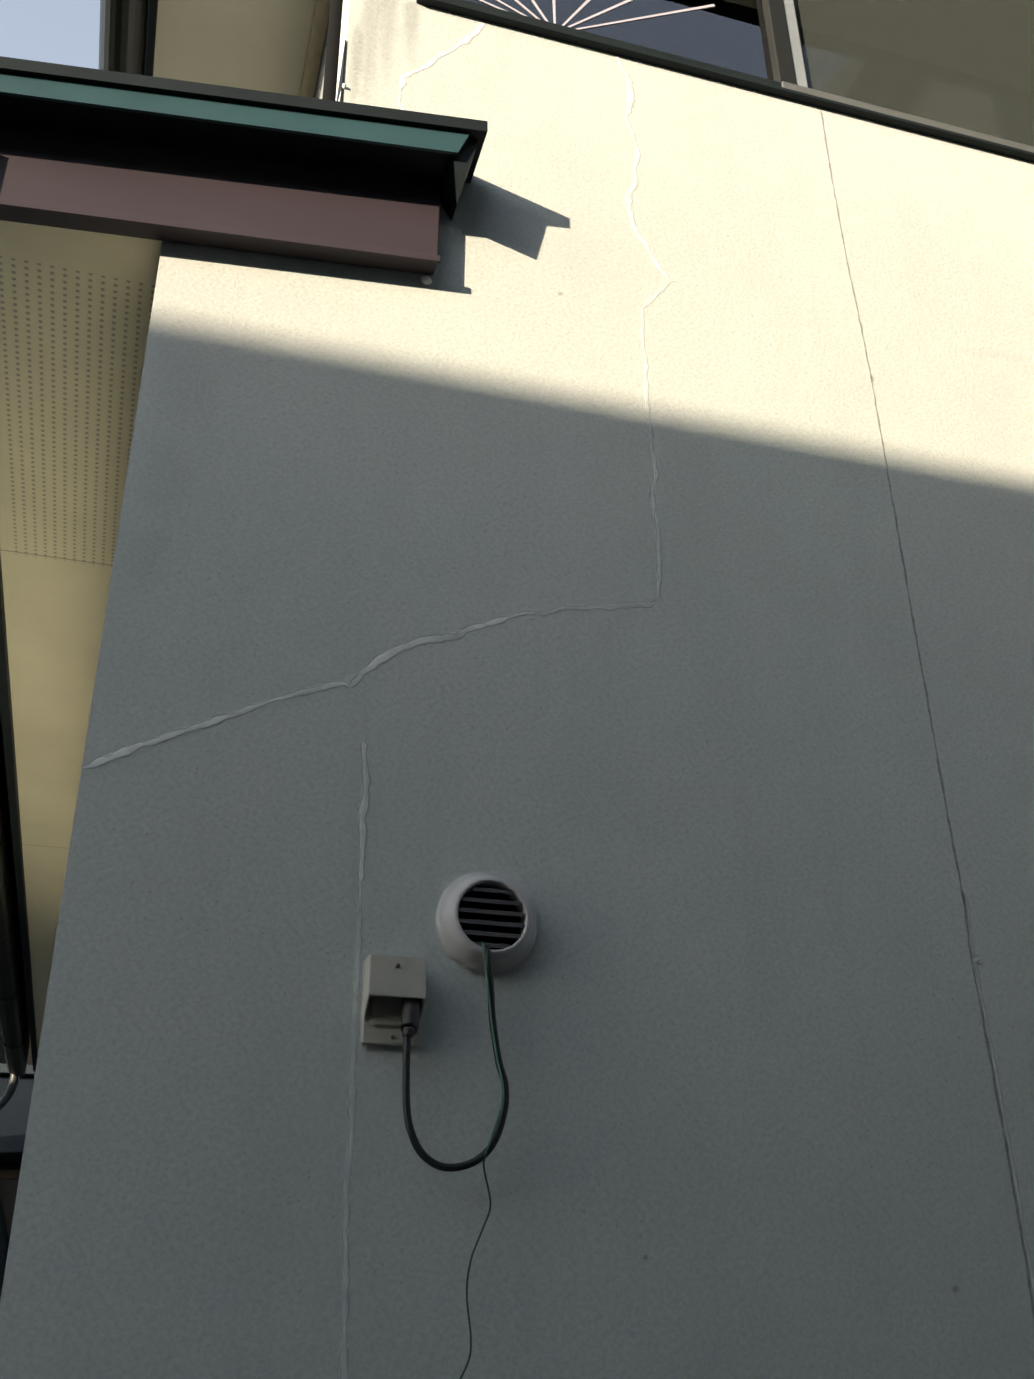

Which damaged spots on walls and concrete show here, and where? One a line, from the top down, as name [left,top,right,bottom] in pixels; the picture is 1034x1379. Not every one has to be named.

crack [397,23,484,110]
crack [82,56,688,769]
crack [353,742,370,1007]
crack [341,1041,356,1379]